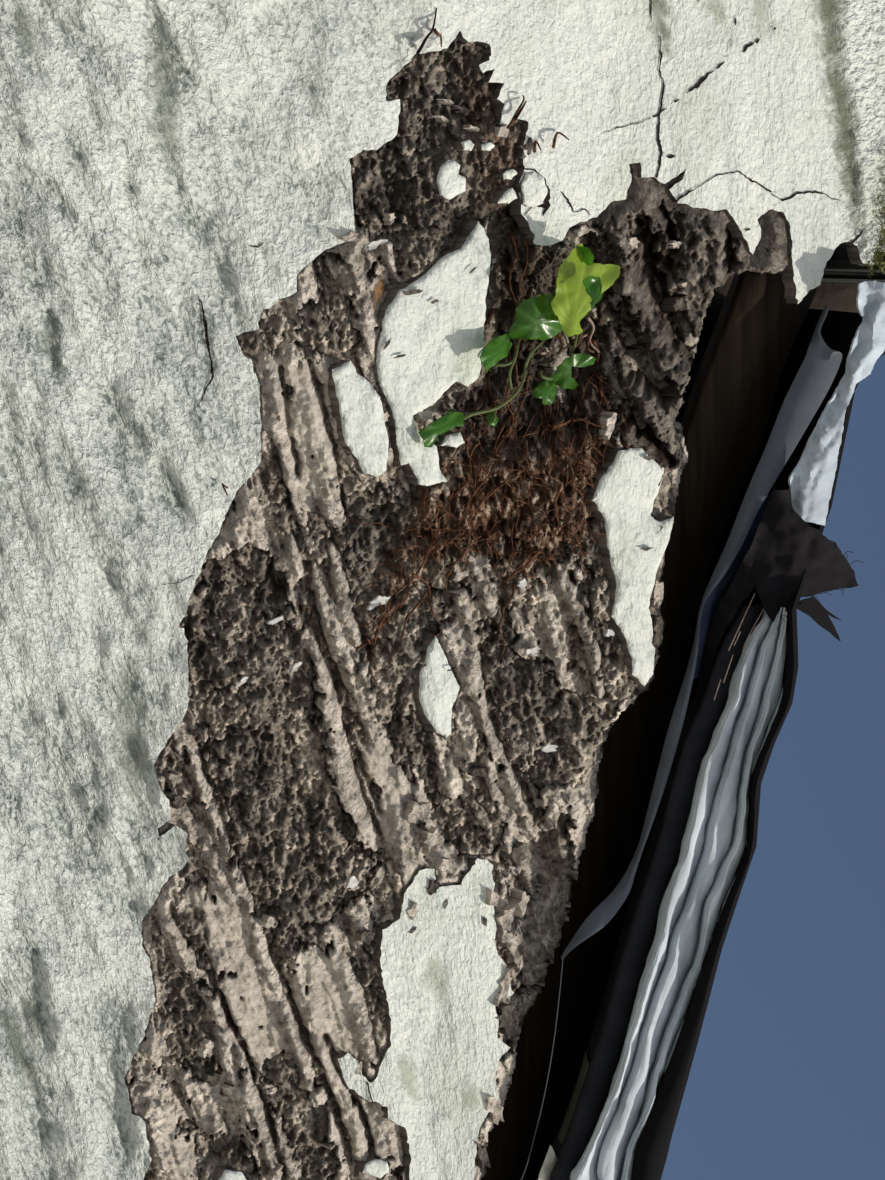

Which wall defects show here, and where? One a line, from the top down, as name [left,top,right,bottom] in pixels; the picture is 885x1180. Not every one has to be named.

crack [602,0,776,178]
crack [675,171,841,202]
water stain [821,0,862,200]
crack [196,295,214,408]
flaking render [124,8,789,1180]